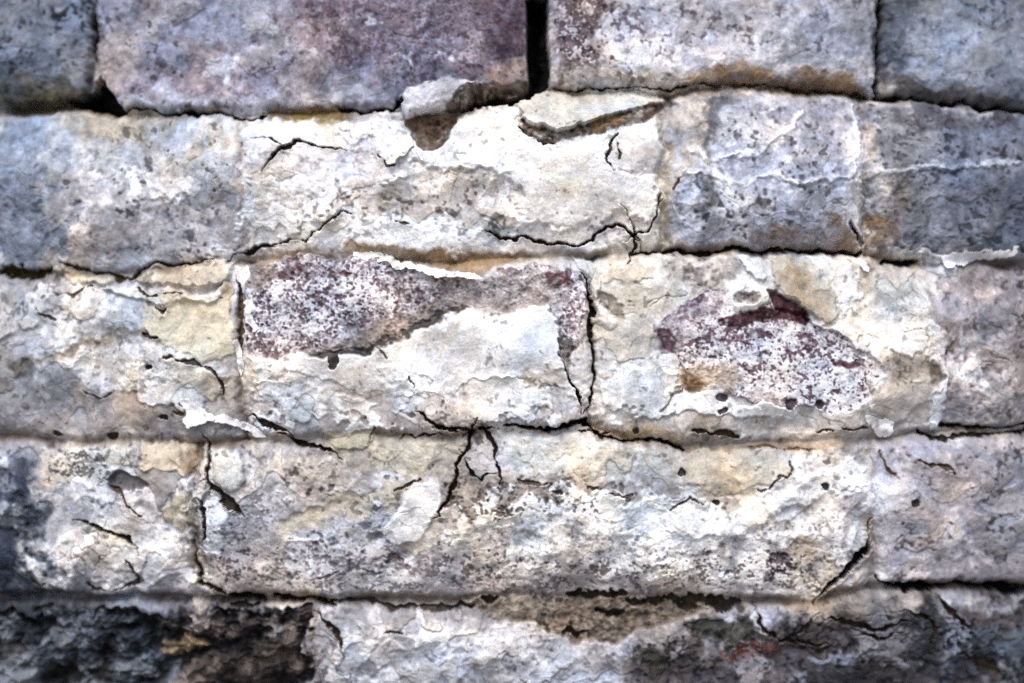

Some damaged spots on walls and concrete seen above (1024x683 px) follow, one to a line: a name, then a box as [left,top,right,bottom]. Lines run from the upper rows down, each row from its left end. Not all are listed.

crack [255,137,339,167]
spalling [386,81,664,164]
crack [489,178,680,264]
spalling [144,251,619,438]
crack [558,273,596,413]
spalling [653,254,941,437]
crack [194,441,242,596]
crack [403,412,633,517]
crack [757,523,967,647]
crack [963,652,1000,678]